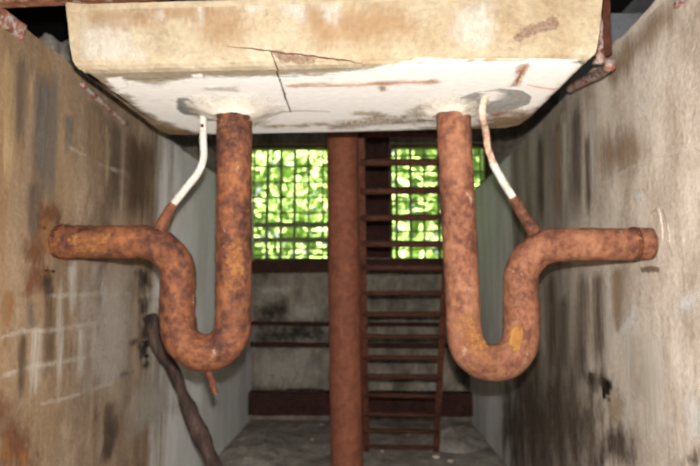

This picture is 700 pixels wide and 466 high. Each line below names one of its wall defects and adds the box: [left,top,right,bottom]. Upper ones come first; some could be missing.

damp [16,63,24,137]
crack [227,46,356,114]
crack [321,80,440,91]
damp [30,82,57,236]
damp [112,125,121,200]
damp [129,139,148,214]
damp [502,270,634,466]
damp [102,403,118,459]